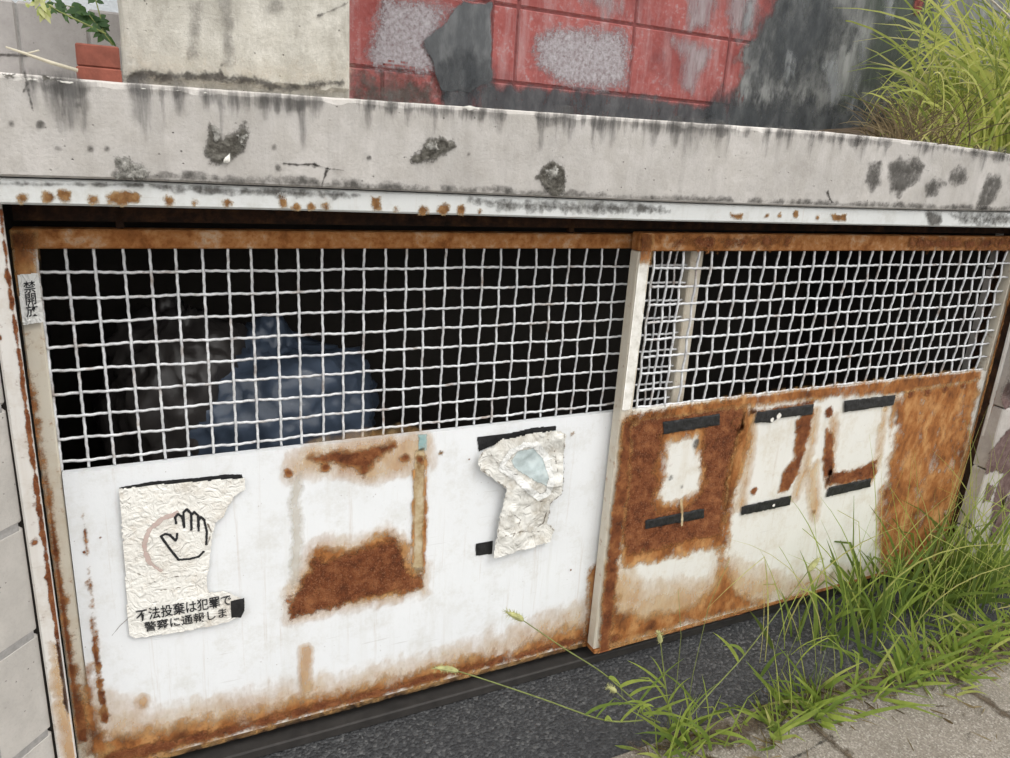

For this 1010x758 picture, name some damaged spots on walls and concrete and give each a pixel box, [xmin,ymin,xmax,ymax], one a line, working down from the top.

peeling [368,0,454,76]
leakage [355,54,493,107]
leakage [707,0,907,145]
spalling [204,121,250,165]
spalling [410,136,457,164]
corrosion [42,189,71,203]
corrosion [87,191,140,207]
corrosion [418,202,465,215]
spalling [535,160,567,196]
leakage [866,158,966,197]
mould [977,177,1002,211]
corrosion [0,209,1010,758]